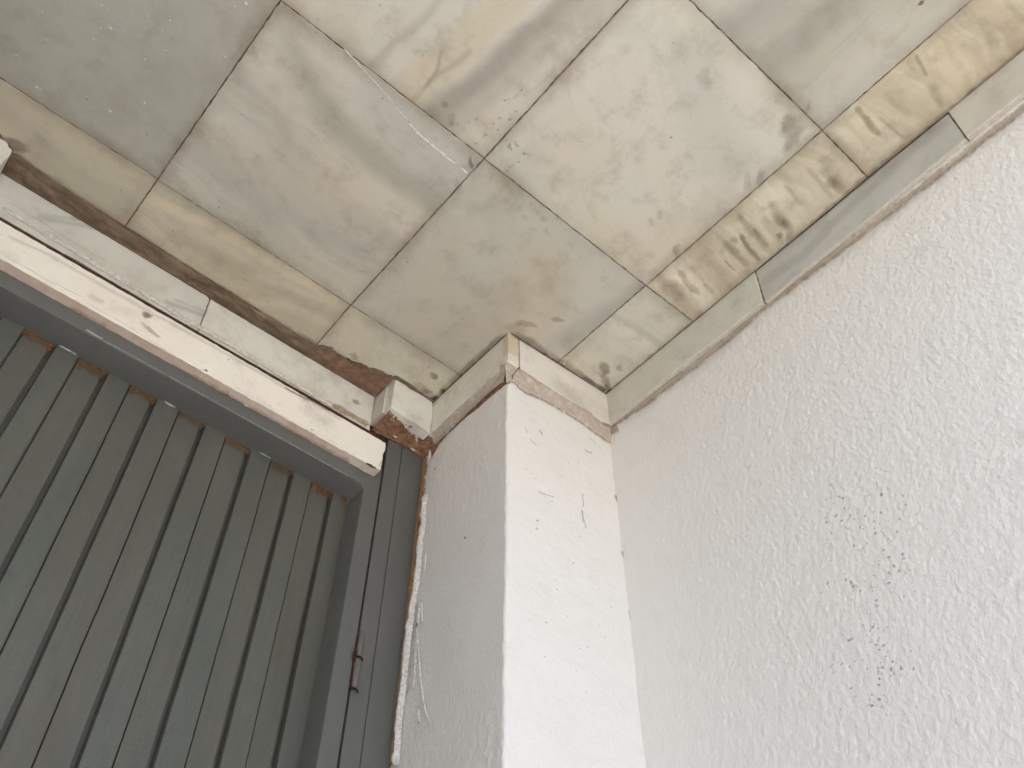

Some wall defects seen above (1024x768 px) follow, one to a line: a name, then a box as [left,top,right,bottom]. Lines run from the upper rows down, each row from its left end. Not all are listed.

spalling [0,134,434,403]
flaking render [372,361,612,766]